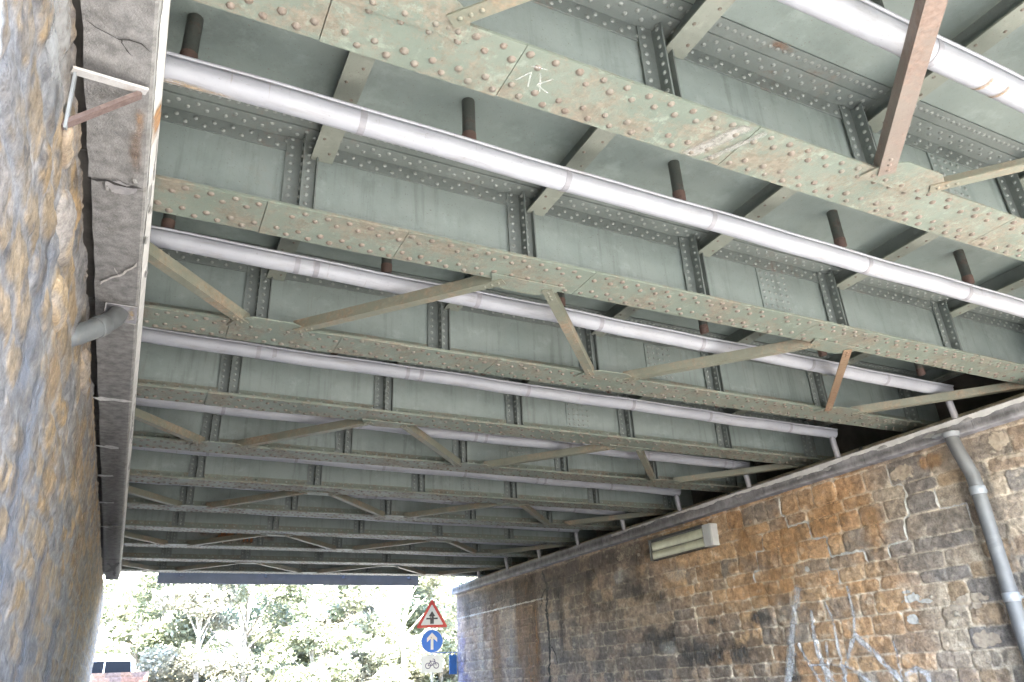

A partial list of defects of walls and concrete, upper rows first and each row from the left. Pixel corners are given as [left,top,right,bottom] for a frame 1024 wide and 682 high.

crack [88,21,149,57]
crack [100,263,137,284]
peeling [89,0,170,577]
crack [540,571,558,682]
water stain [751,612,769,624]
water stain [644,627,748,665]